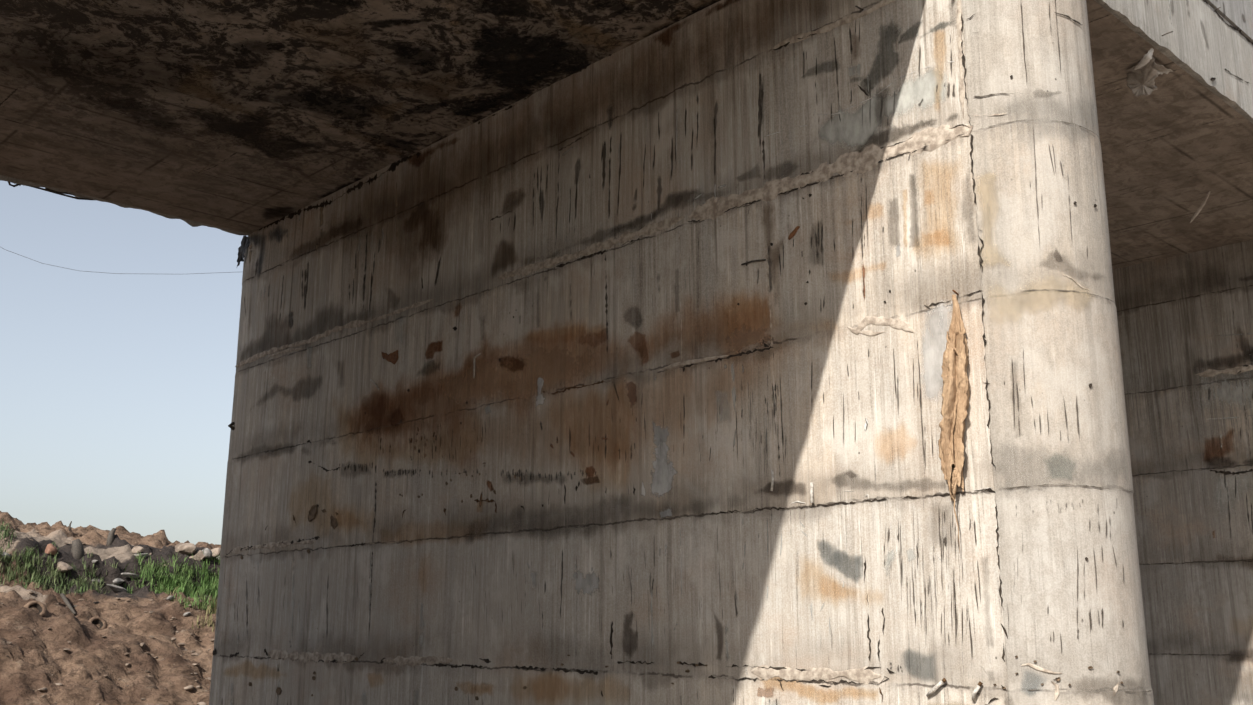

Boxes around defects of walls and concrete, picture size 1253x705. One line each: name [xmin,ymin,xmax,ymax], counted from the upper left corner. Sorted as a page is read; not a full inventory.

crack [1203,0,1253,45]
damp [758,74,779,145]
damp [533,97,698,236]
damp [693,102,725,206]
crack [682,14,1021,662]
crack [444,482,636,515]
crack [1210,468,1253,476]
crack [226,515,368,555]
crack [212,649,283,660]
crack [435,560,894,699]